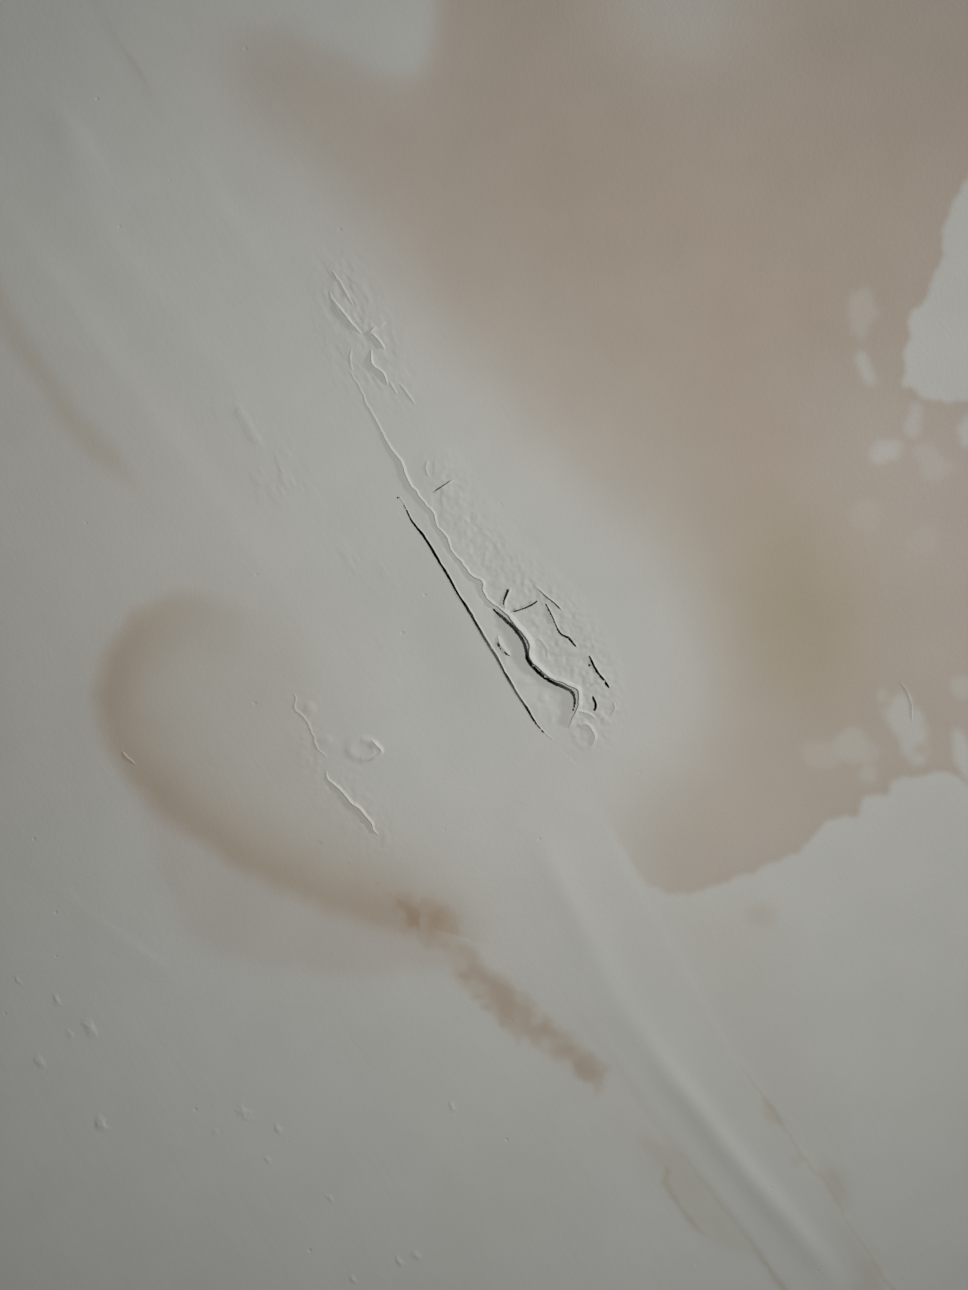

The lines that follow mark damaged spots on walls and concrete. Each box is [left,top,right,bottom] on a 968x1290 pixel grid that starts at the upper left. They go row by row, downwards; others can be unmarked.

leakage [0,428,667,1205]
leakage [208,0,968,899]